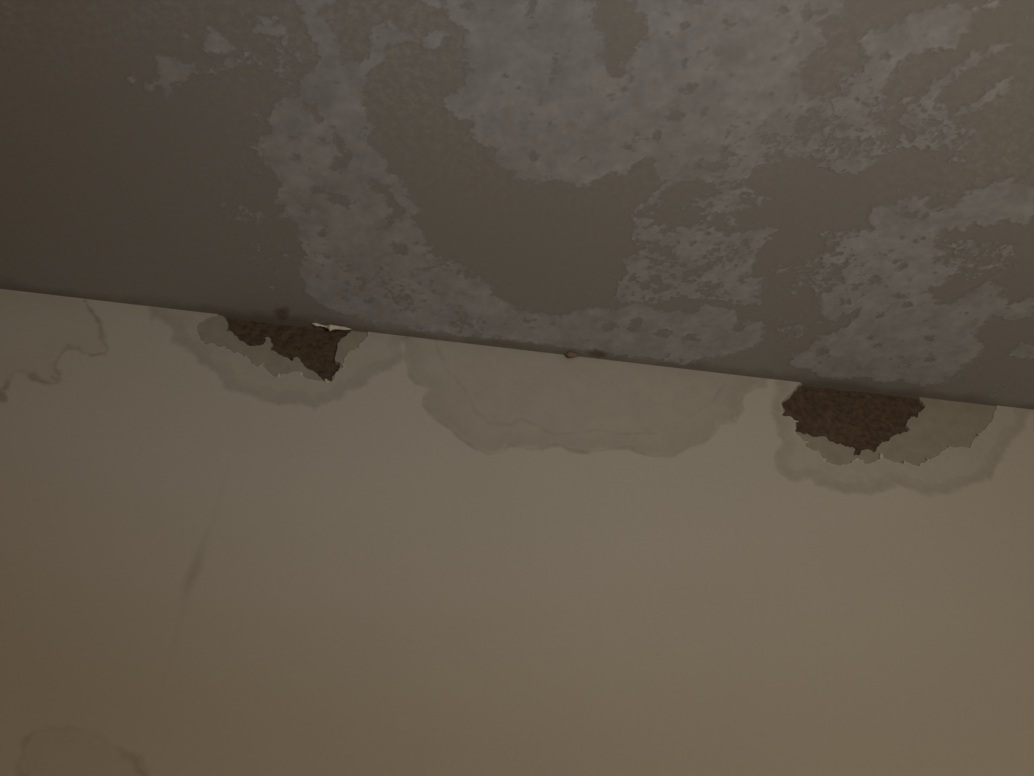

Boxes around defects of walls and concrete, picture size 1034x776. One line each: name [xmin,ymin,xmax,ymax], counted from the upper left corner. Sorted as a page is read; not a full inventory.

damp [126,0,1034,387]
flaking render [195,314,369,383]
flaking render [780,382,998,467]